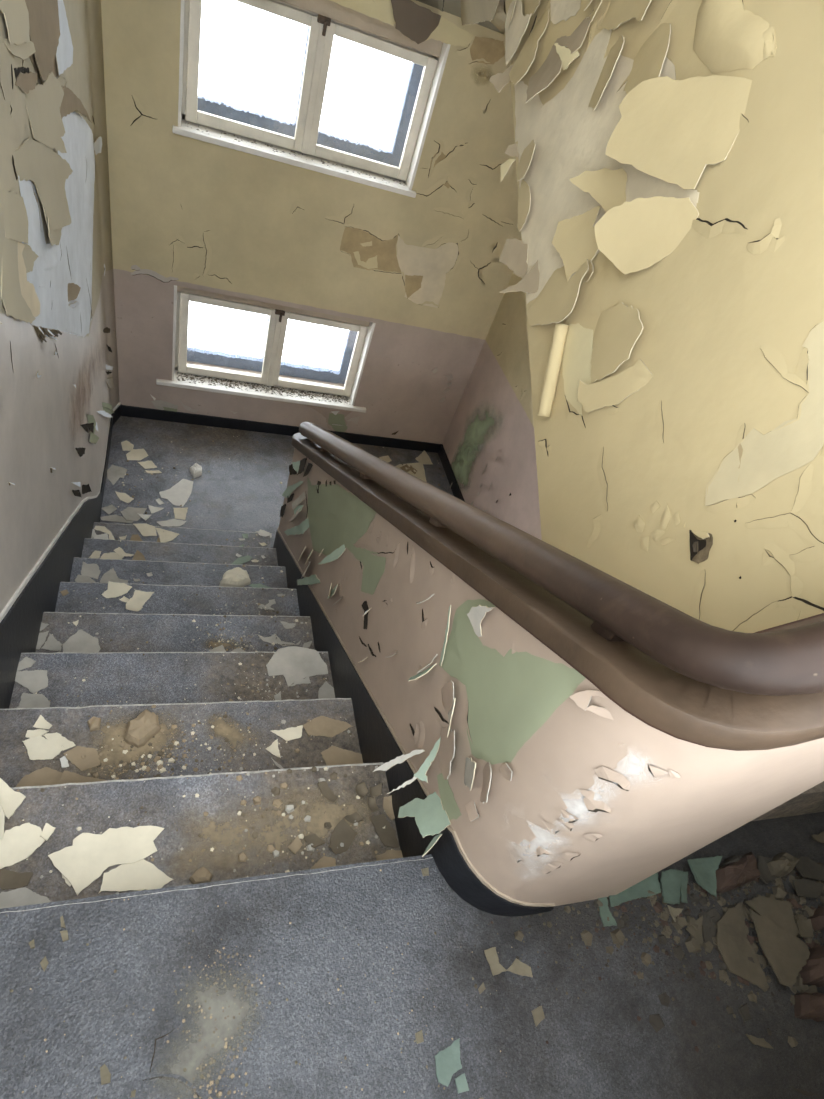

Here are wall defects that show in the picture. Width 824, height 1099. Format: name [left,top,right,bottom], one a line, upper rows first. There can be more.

peeling [0,0,105,358]
peeling [325,0,752,430]
peeling [75,402,114,457]
peeling [236,457,398,663]
peeling [307,406,360,433]
peeling [379,451,433,482]
crack [692,569,706,620]
spalling [689,530,713,564]
peeling [705,319,824,513]
crack [733,446,824,633]
peeling [266,716,363,769]
peeling [288,594,614,869]